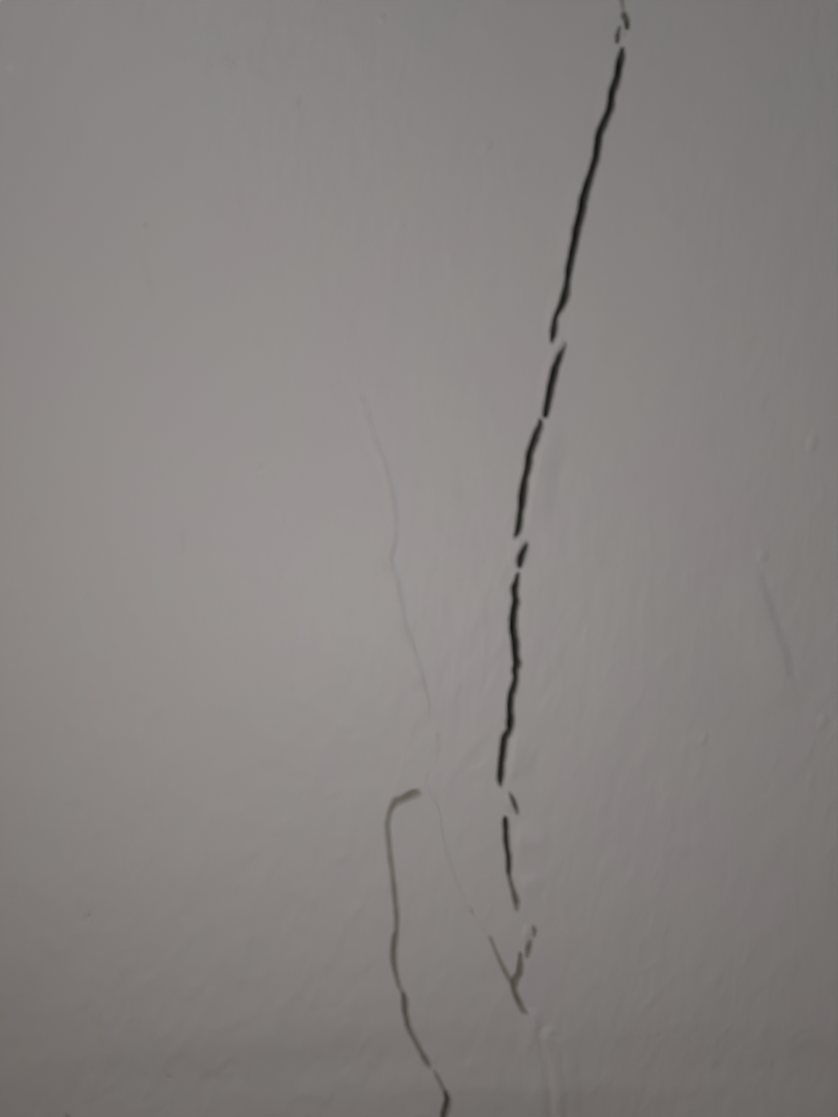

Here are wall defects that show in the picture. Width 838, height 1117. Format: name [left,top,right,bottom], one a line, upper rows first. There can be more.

crack [385,789,451,1117]
crack [489,0,630,1014]